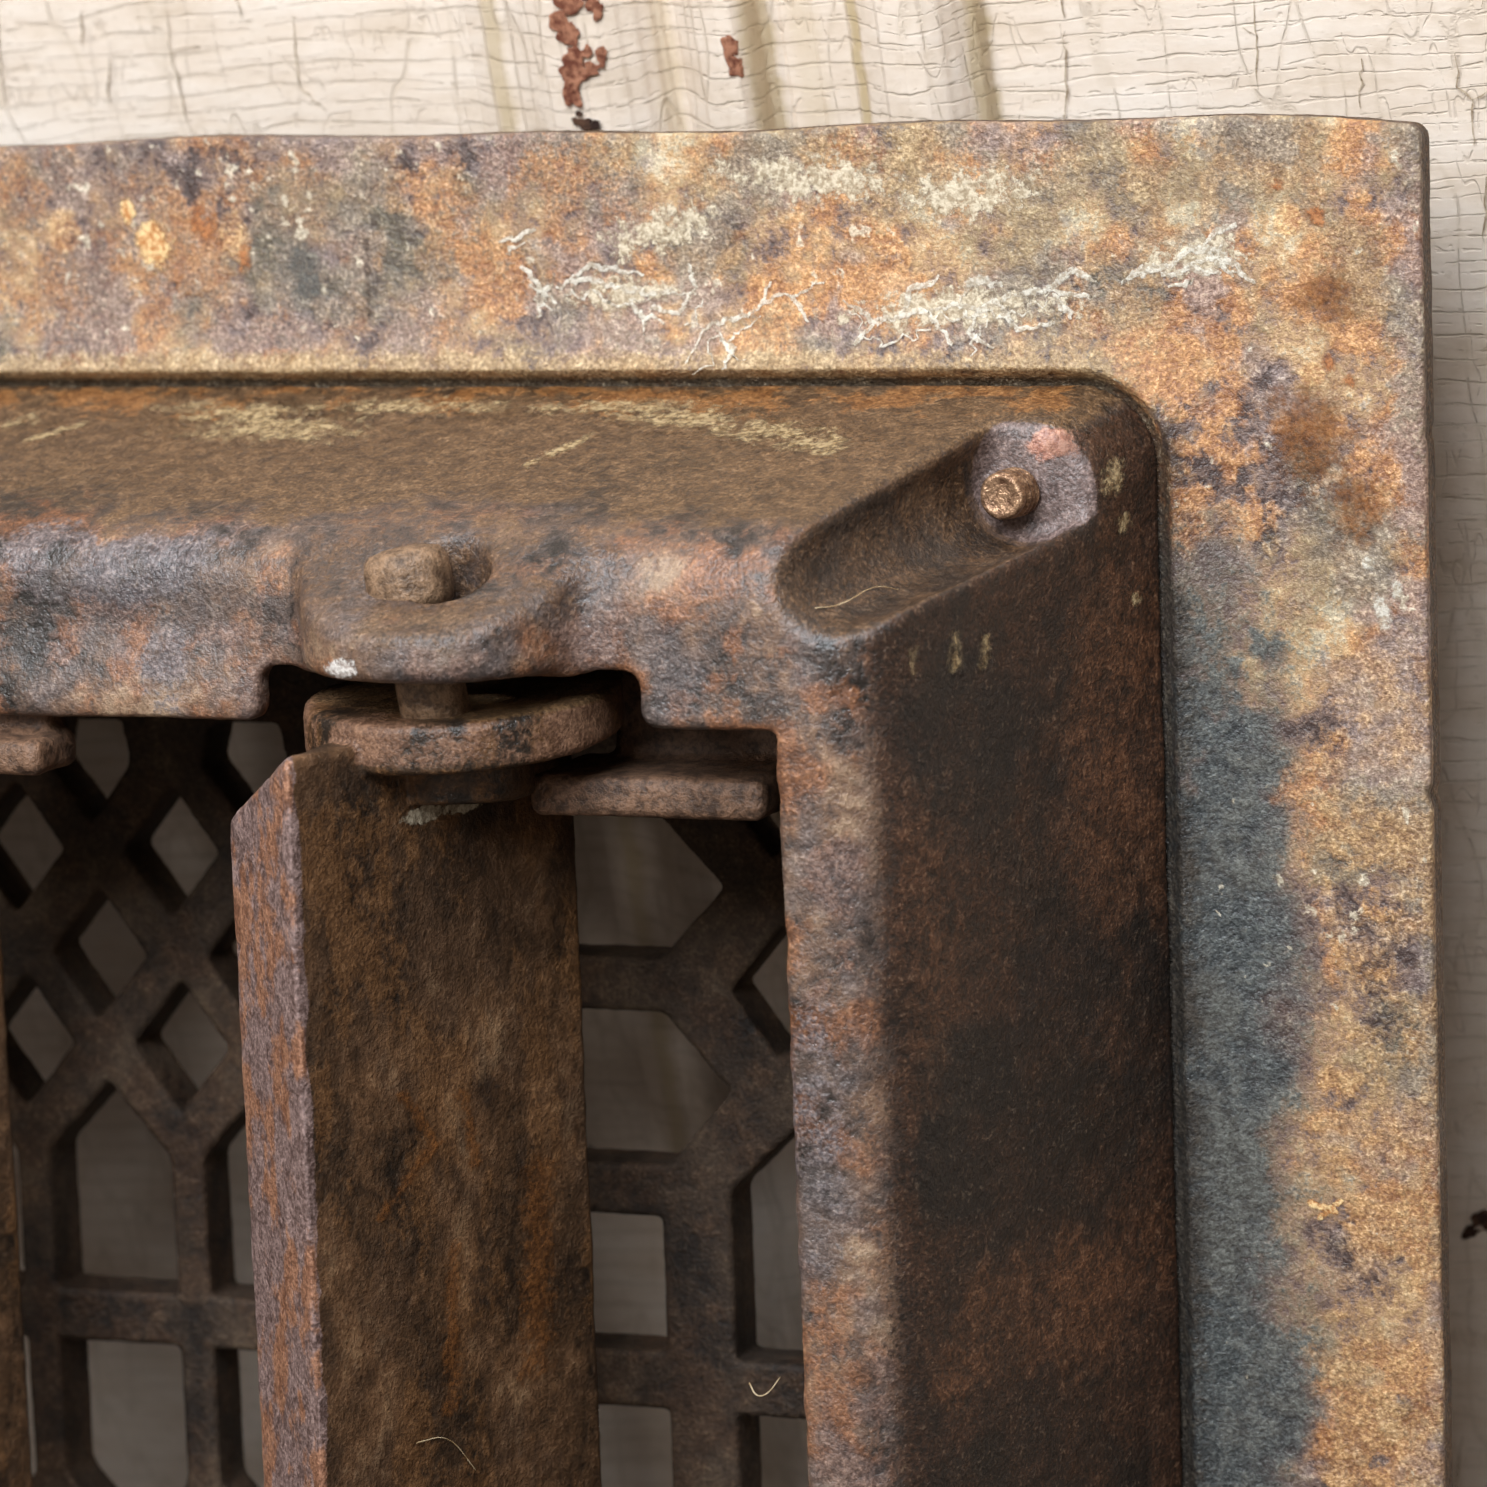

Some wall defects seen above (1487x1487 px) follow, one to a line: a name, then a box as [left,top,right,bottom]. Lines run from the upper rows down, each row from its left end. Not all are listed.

crack [80,11,111,105]
crack [166,10,200,131]
crack [293,16,327,111]
crack [1060,0,1068,119]
crack [1242,0,1259,89]
crack [1357,58,1365,109]
crack [1455,57,1487,241]
rust [120,199,174,270]
rust [1306,207,1324,225]
rust [1323,355,1355,387]
rust [1307,1199,1343,1220]